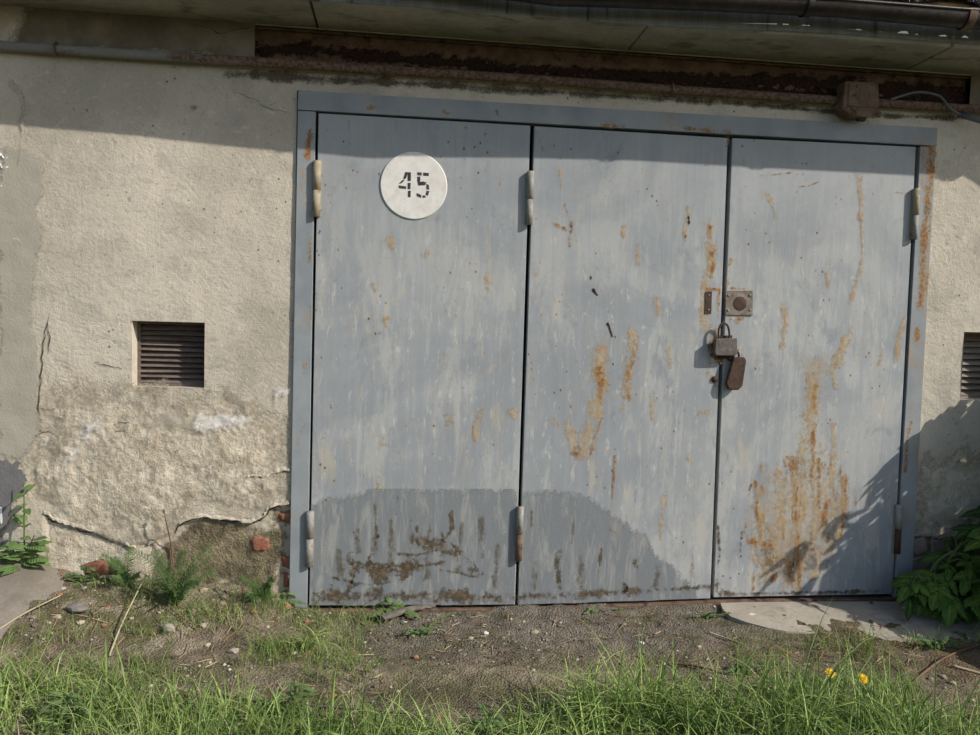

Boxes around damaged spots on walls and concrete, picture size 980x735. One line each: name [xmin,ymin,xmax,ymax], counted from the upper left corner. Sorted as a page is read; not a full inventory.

rust [224,39,970,121]
damp [969,75,980,105]
rust [918,145,937,307]
rust [701,223,745,364]
crack [24,317,55,454]
rust [566,323,613,457]
crack [45,515,122,546]
flaking render [21,379,291,587]
crack [175,505,286,534]
damp [309,488,697,609]
rust [578,583,650,598]
rust [672,375,860,597]